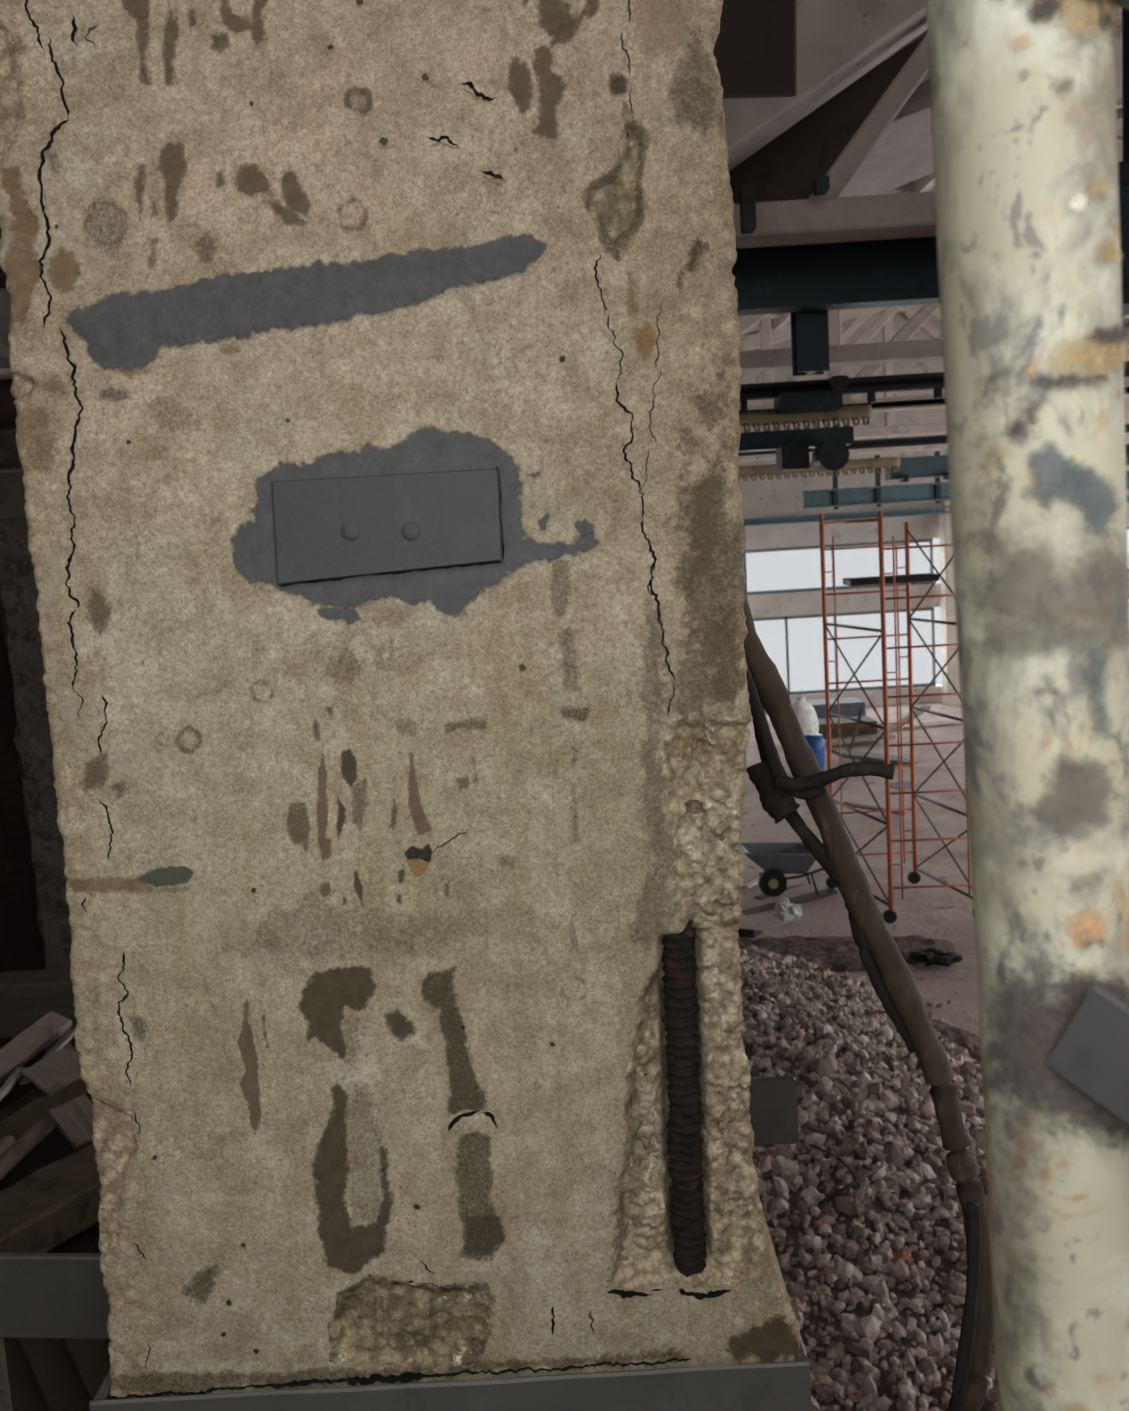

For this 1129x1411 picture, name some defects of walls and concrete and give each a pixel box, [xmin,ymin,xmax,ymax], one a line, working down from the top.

water stain [508,0,598,138]
rust [1018,0,1120,48]
water stain [217,164,310,224]
crack [24,0,108,754]
crack [593,255,676,719]
water stain [287,707,365,859]
crack [117,952,140,1135]
water stain [299,966,376,1058]
spalling [609,710,769,1289]
water stain [312,1084,392,1273]
crack [448,1110,498,1131]
spalling [326,1276,496,1371]